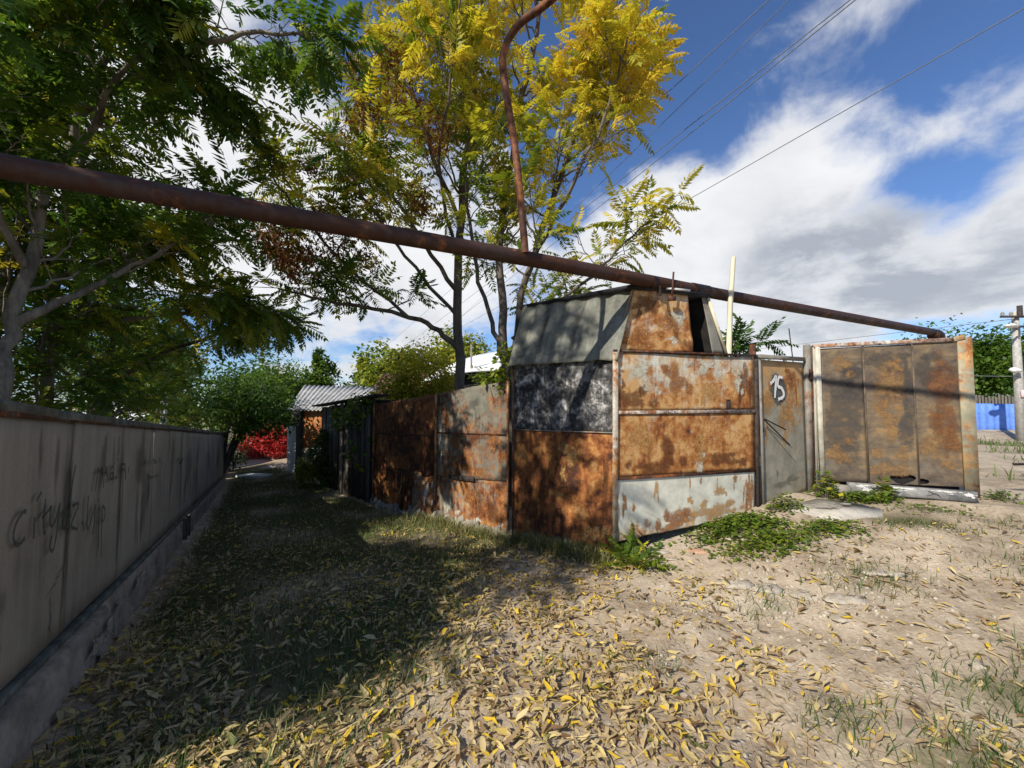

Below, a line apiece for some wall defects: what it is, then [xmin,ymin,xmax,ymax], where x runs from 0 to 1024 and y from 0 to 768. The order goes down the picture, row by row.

rust [623,296,678,349]
rust [618,370,657,408]
rust [660,362,693,395]
rust [738,362,797,443]
rust [919,359,961,469]
rust [441,403,502,525]
rust [527,443,580,526]
rust [581,464,610,541]
rust [625,436,754,532]